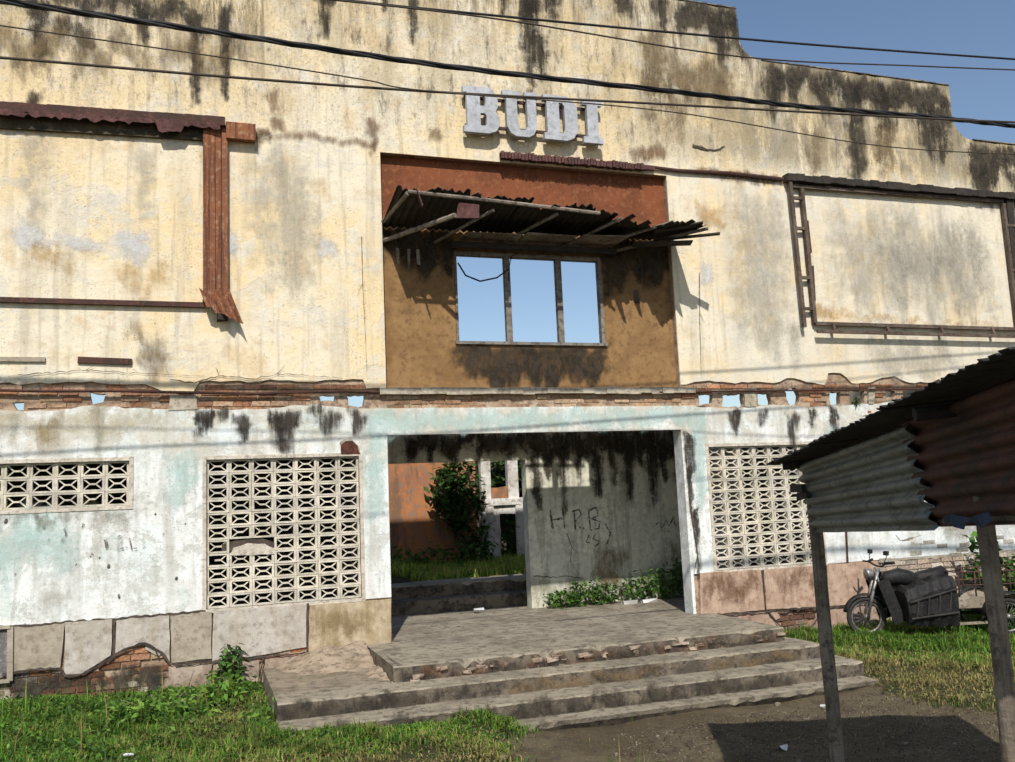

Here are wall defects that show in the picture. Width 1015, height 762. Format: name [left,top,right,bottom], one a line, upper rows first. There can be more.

damp [0,0,241,103]
damp [761,63,952,179]
damp [453,345,606,388]
flaking render [0,385,88,411]
damp [194,407,251,442]
damp [268,402,366,452]
flaking render [106,384,773,504]
flaking render [801,384,928,416]
damp [405,430,700,583]
flaking render [0,646,170,700]
spalling [461,652,608,674]
spalling [664,638,729,650]